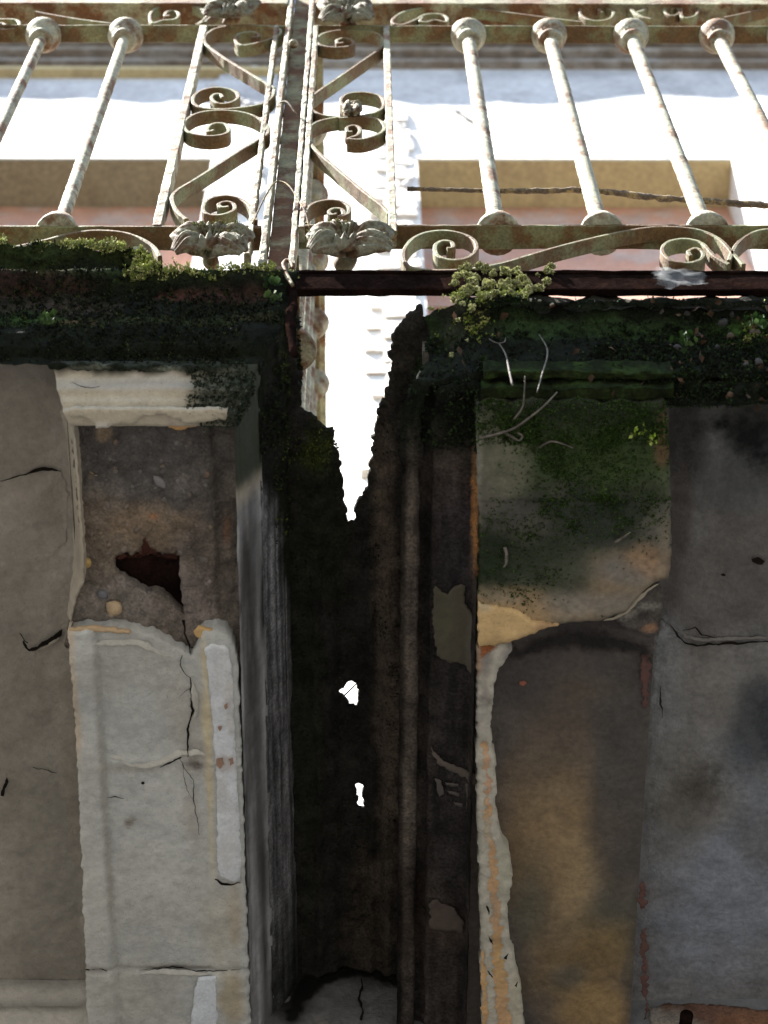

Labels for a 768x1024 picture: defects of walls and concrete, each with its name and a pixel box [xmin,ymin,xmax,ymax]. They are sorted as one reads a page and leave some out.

crack [20,629,63,652]
spalling [64,405,242,883]
crack [179,620,199,833]
spalling [428,584,559,1024]